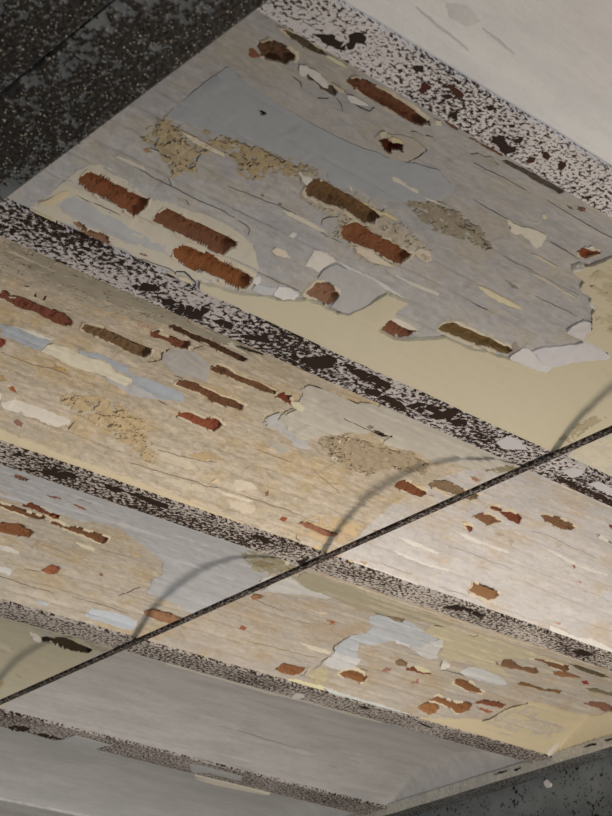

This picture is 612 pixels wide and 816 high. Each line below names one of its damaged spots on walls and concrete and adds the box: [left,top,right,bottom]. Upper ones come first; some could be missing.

peeling [0,0,251,176]
flaking render [258,25,442,127]
peeling [30,163,387,313]
peeling [140,66,492,268]
flaking render [470,153,564,194]
peeling [506,219,547,249]
flaking render [572,245,601,272]
peeling [0,291,528,502]
peeling [435,320,610,373]
peeling [0,464,612,716]